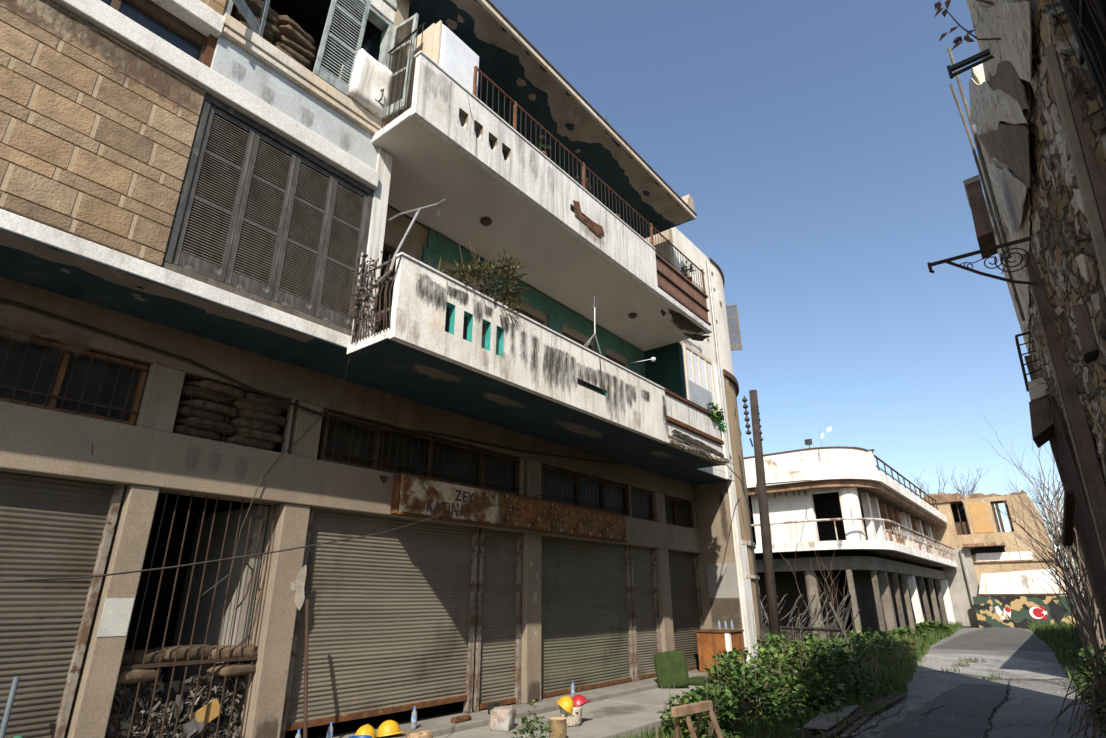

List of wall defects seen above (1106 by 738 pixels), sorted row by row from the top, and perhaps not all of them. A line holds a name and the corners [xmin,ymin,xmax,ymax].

peeling [446,0,691,225]
peeling [989,61,1029,110]
peeling [978,124,1031,188]
spalling [573,200,604,241]
peeling [1073,189,1086,215]
peeling [1077,254,1089,281]
leakage [413,279,649,408]
crack [927,671,1015,738]